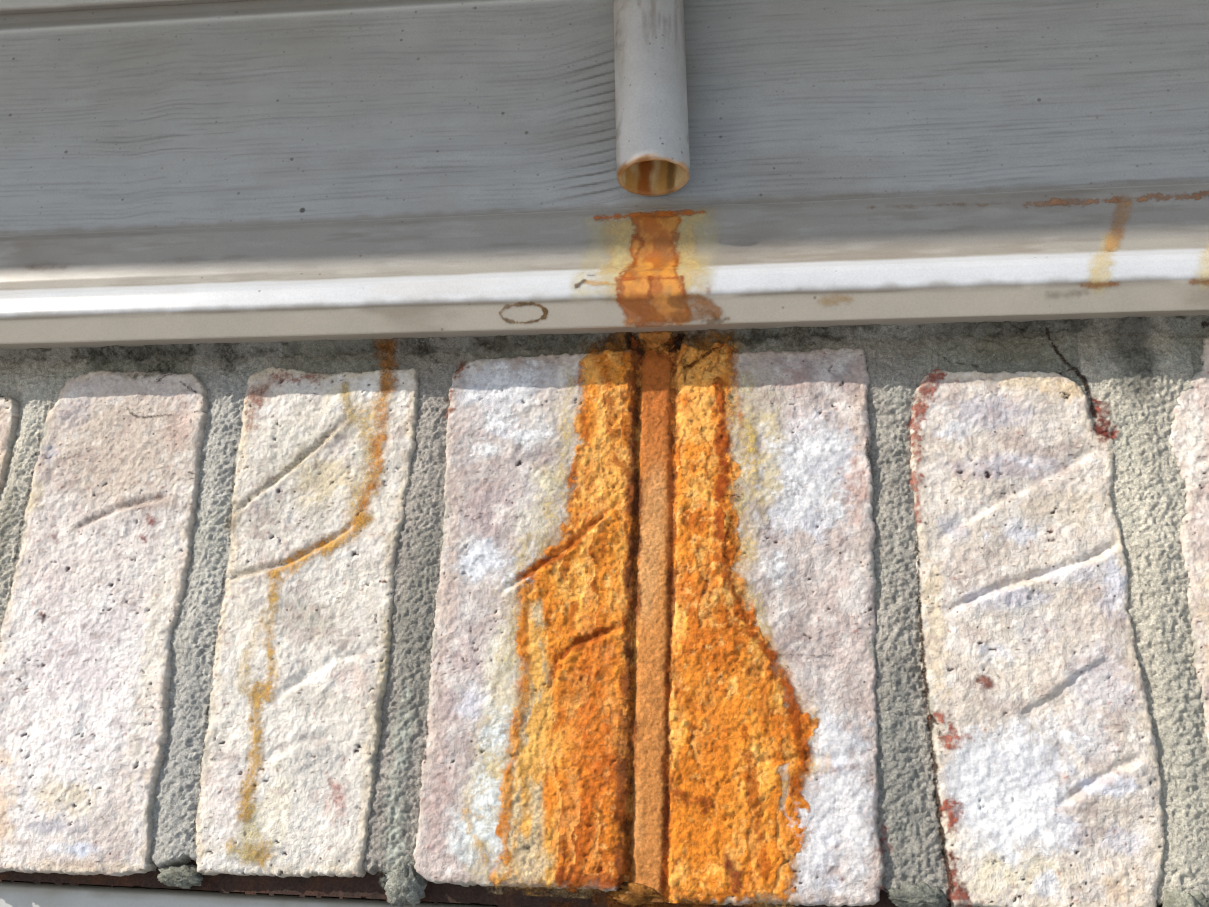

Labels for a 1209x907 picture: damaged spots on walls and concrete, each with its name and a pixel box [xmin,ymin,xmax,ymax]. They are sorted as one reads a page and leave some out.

rust [226,339,396,866]
rust [464,210,820,907]
crack [1046,328,1096,418]
rust [1027,191,1209,287]